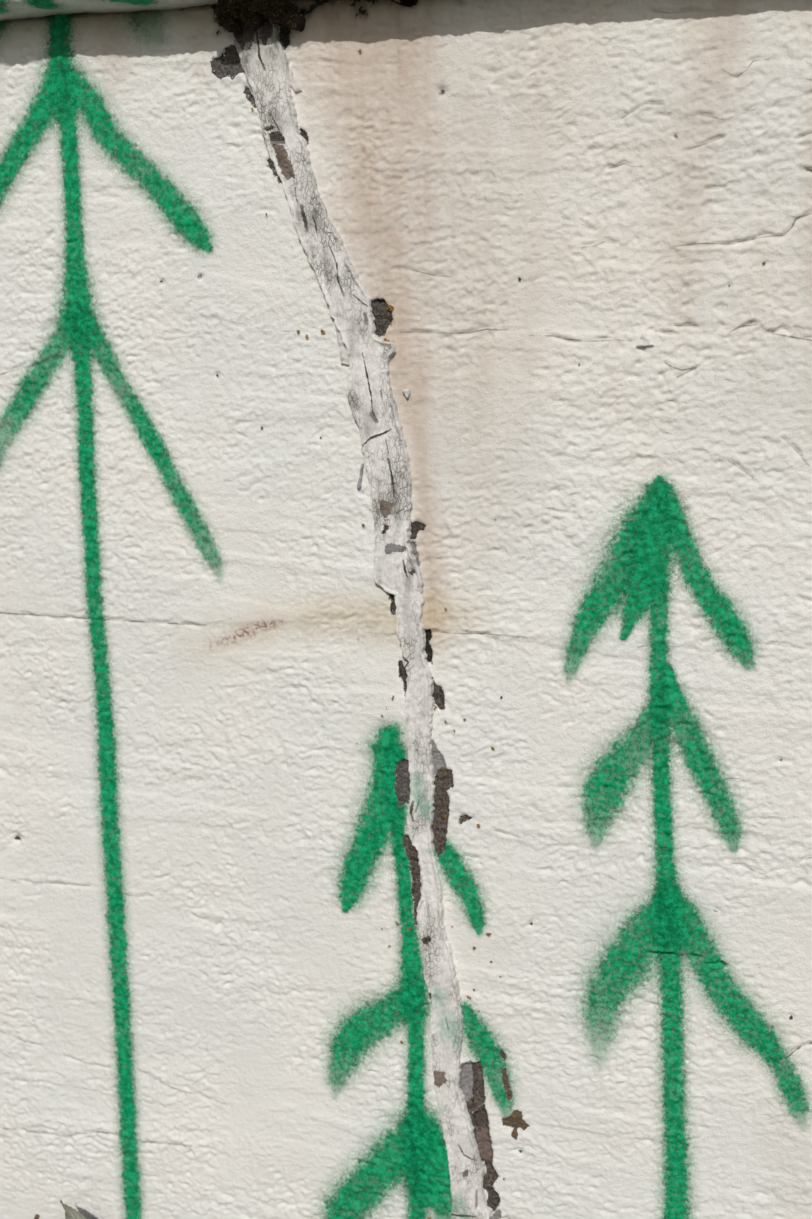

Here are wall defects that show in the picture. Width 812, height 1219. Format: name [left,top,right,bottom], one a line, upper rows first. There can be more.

spalling [210,45,257,108]
spalling [409,521,426,566]
crack [233,16,493,1219]
spalling [398,660,408,693]
spalling [424,629,445,710]
spalling [394,758,410,807]
spalling [431,740,472,858]
spalling [402,835,422,925]
spalling [459,1050,530,1219]